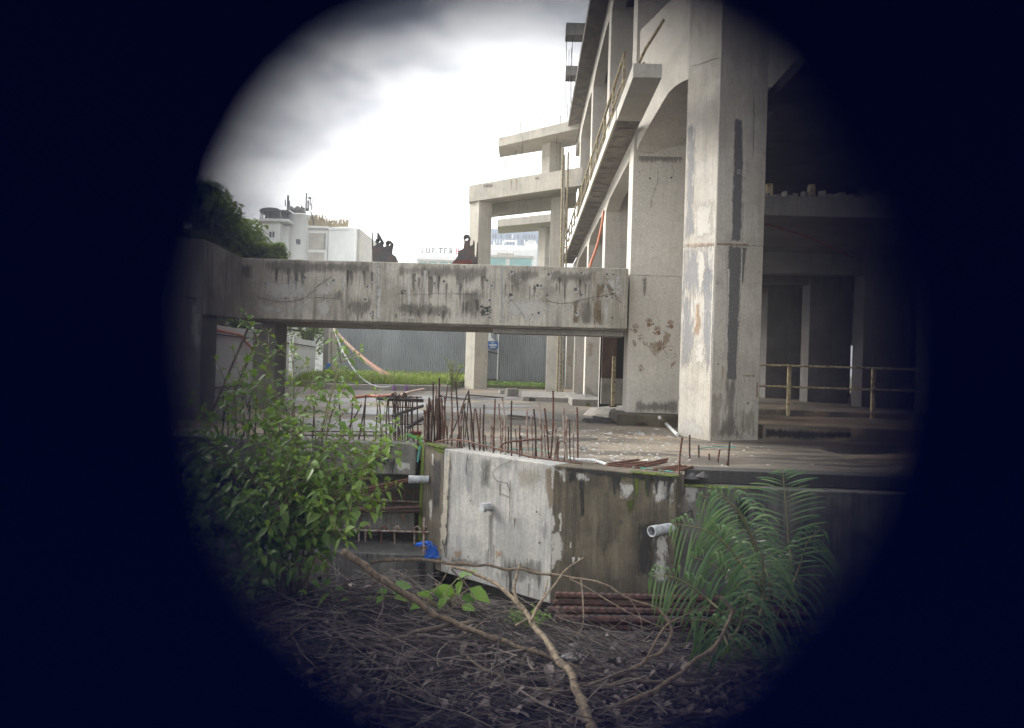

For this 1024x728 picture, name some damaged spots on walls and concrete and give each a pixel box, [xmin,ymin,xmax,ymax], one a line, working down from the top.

peeling [694,200,713,293]
damp [727,136,747,434]
peeling [694,339,707,369]
spalling [275,378,731,556]
damp [545,469,553,507]
damp [566,468,675,556]
damp [637,523,668,580]